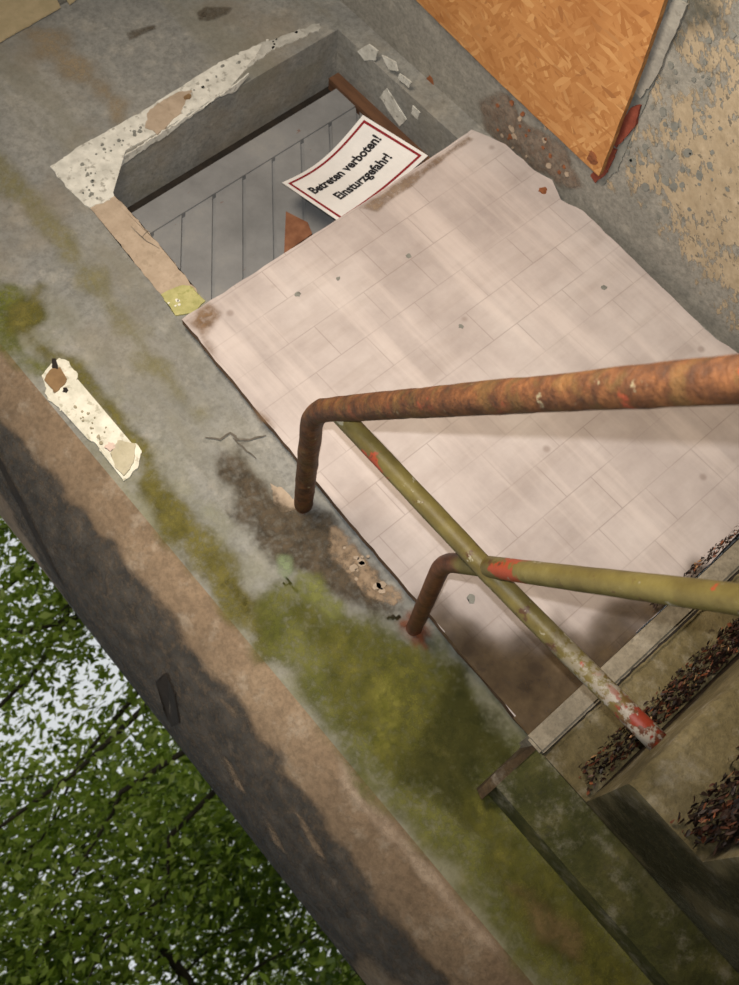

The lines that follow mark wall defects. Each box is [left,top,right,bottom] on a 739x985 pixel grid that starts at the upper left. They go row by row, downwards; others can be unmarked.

flaking render [480,94,580,188]
peeling [590,0,739,331]
damp [219,457,390,617]
flaking render [329,526,402,605]
damp [563,601,665,668]
damp [417,610,583,823]